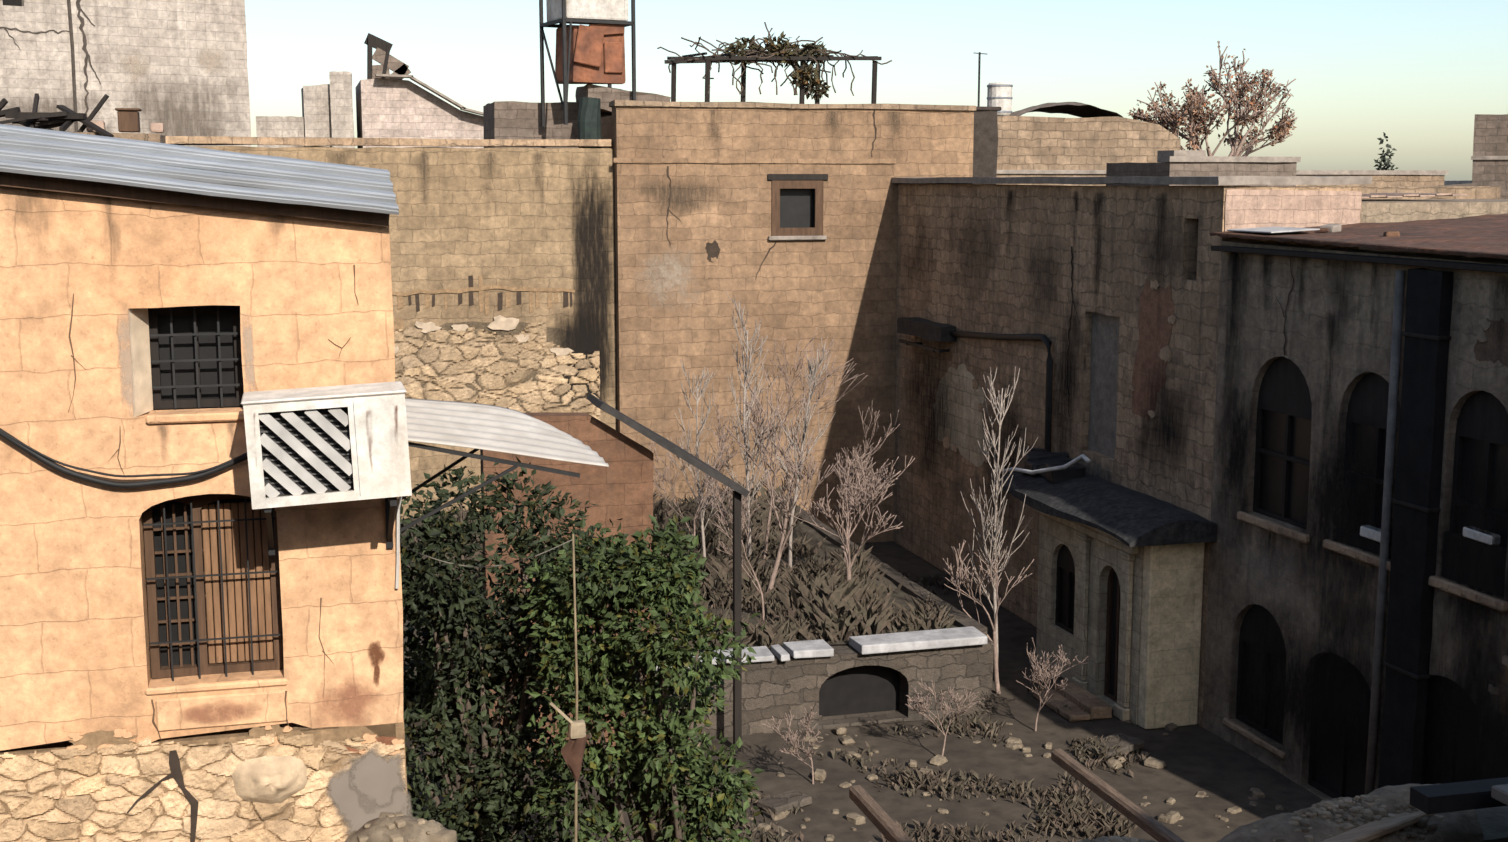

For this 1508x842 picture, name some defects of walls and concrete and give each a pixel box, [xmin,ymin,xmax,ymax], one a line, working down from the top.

crack [0,0,101,118]
crack [666,166,682,244]
leakage [561,182,610,400]
spalling [1473,318,1508,367]
leakage [988,409,1020,512]